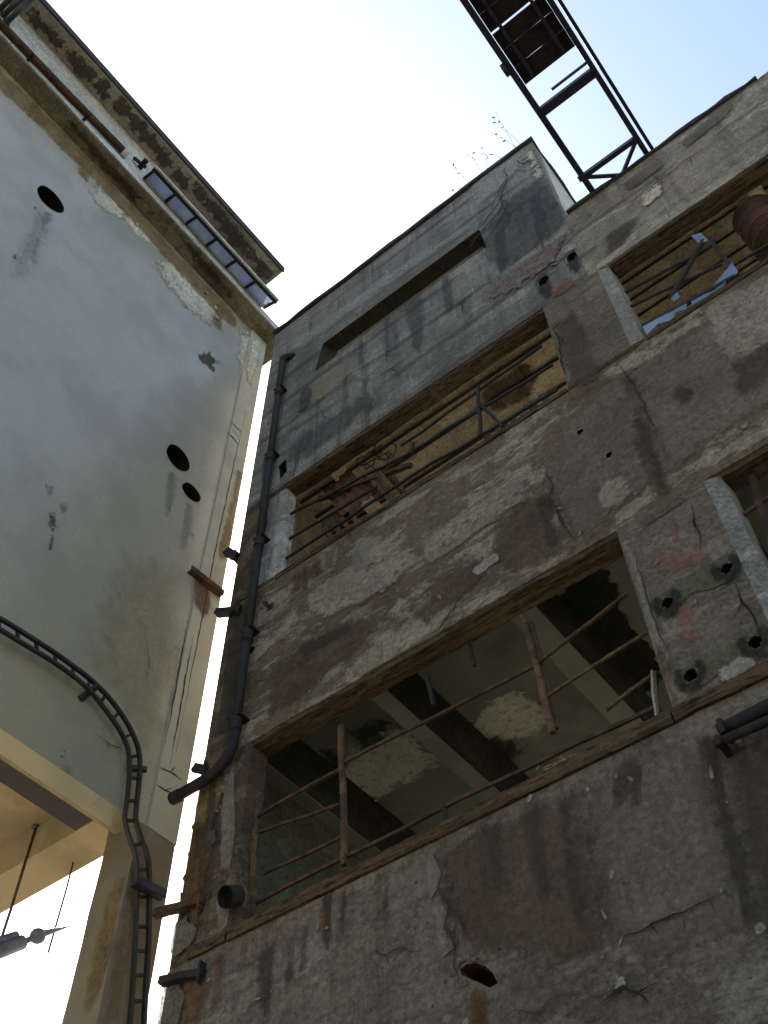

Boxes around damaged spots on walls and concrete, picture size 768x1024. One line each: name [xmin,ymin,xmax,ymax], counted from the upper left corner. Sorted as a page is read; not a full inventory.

spalling [25,7,277,280]
peeling [155,258,219,328]
peeling [235,308,261,384]
crack [210,413,246,578]
crack [691,504,701,551]
crack [735,583,760,632]
crack [157,612,204,793]
rust [176,818,212,926]
crack [432,853,464,985]
damp [428,791,609,959]
crack [611,890,726,945]
damp [698,737,768,928]